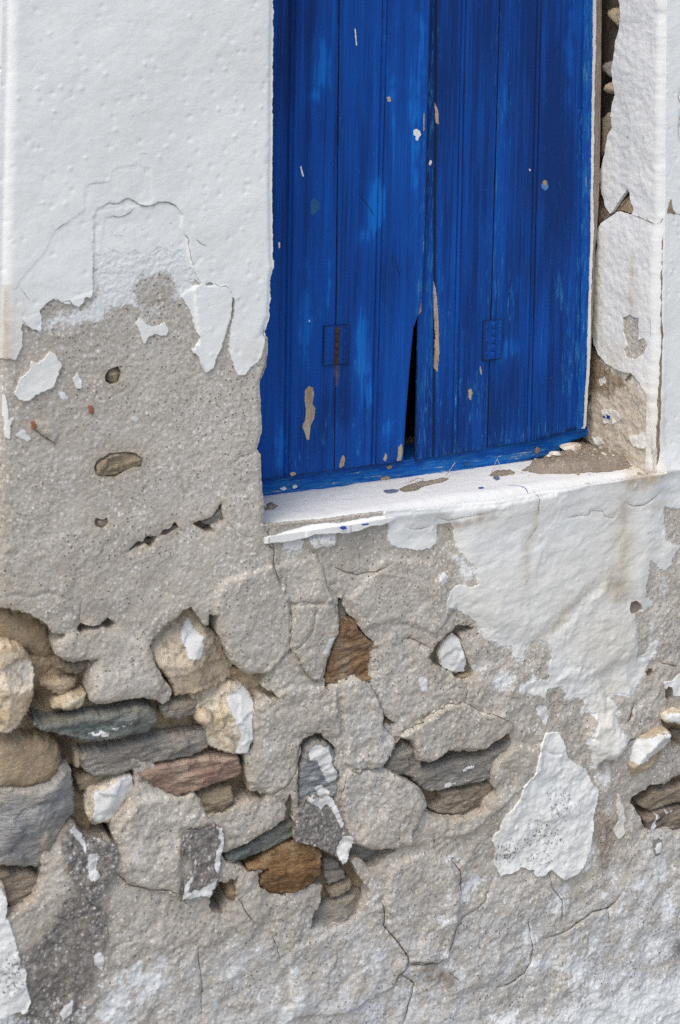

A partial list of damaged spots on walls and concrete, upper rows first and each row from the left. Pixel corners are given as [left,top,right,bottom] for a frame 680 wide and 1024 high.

spalling [600,0,620,169]
spalling [597,184,633,226]
crack [289,561,386,682]
peeling [0,222,680,1024]
crack [368,681,507,734]
crack [383,886,490,1016]
crack [500,872,619,987]